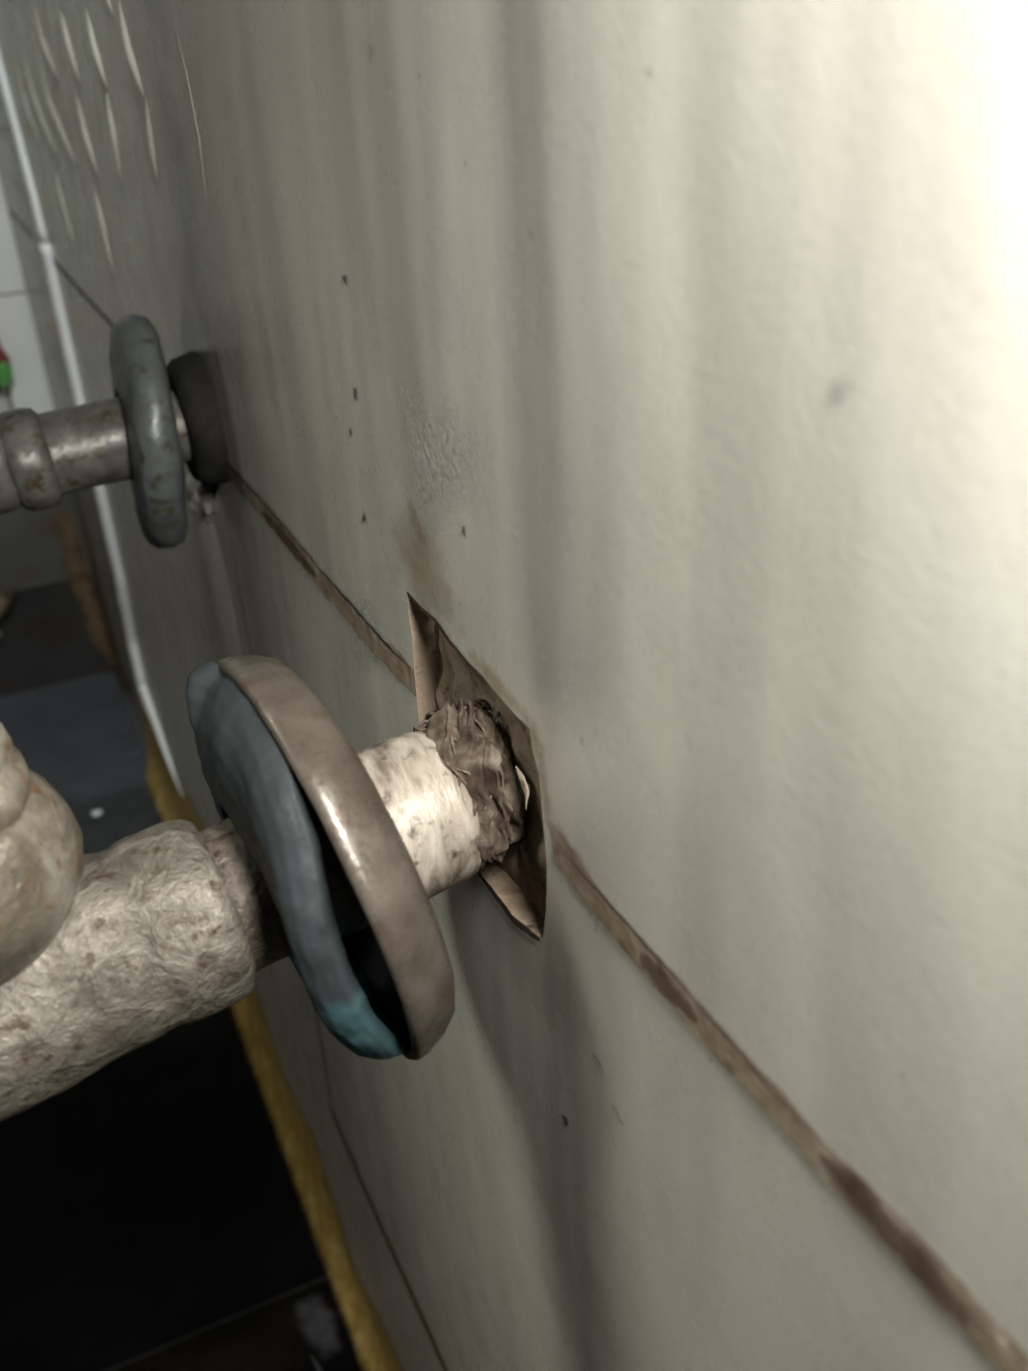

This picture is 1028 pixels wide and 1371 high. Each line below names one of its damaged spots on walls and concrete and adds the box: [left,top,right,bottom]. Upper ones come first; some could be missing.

spalling [407,592,547,938]